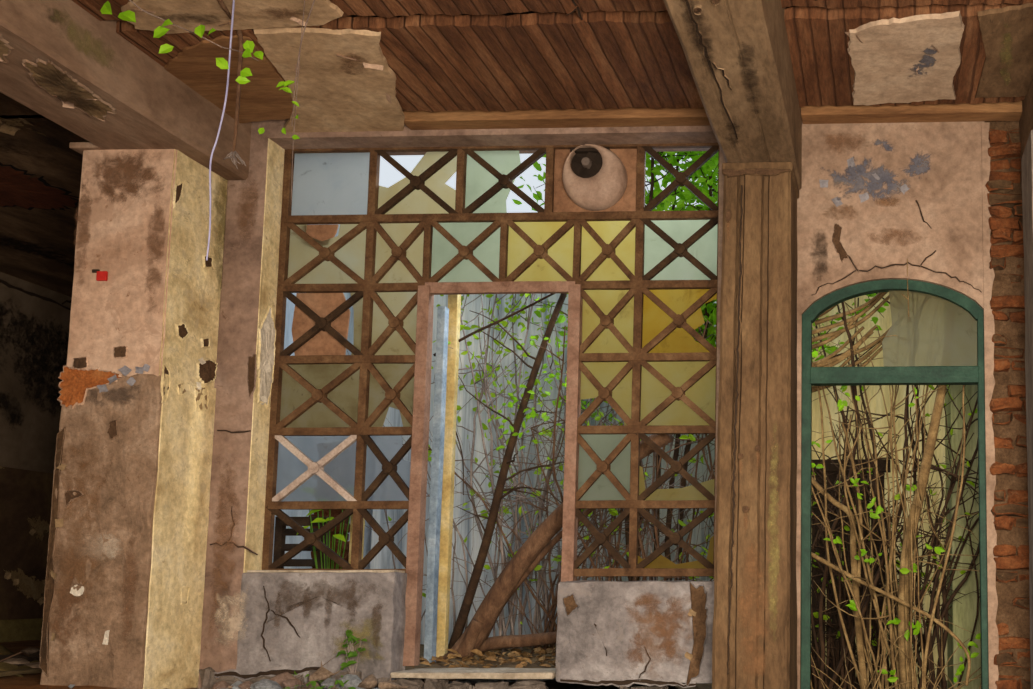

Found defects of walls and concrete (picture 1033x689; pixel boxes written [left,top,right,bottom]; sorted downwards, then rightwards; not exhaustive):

peeling [0,33,116,122]
peeling [0,117,46,136]
peeling [808,135,930,262]
crack [811,196,982,296]
spalling [57,337,218,412]
spalling [175,321,189,342]
spalling [981,122,1031,689]
crack [210,506,258,555]
crack [214,585,321,681]
rust [633,596,690,655]